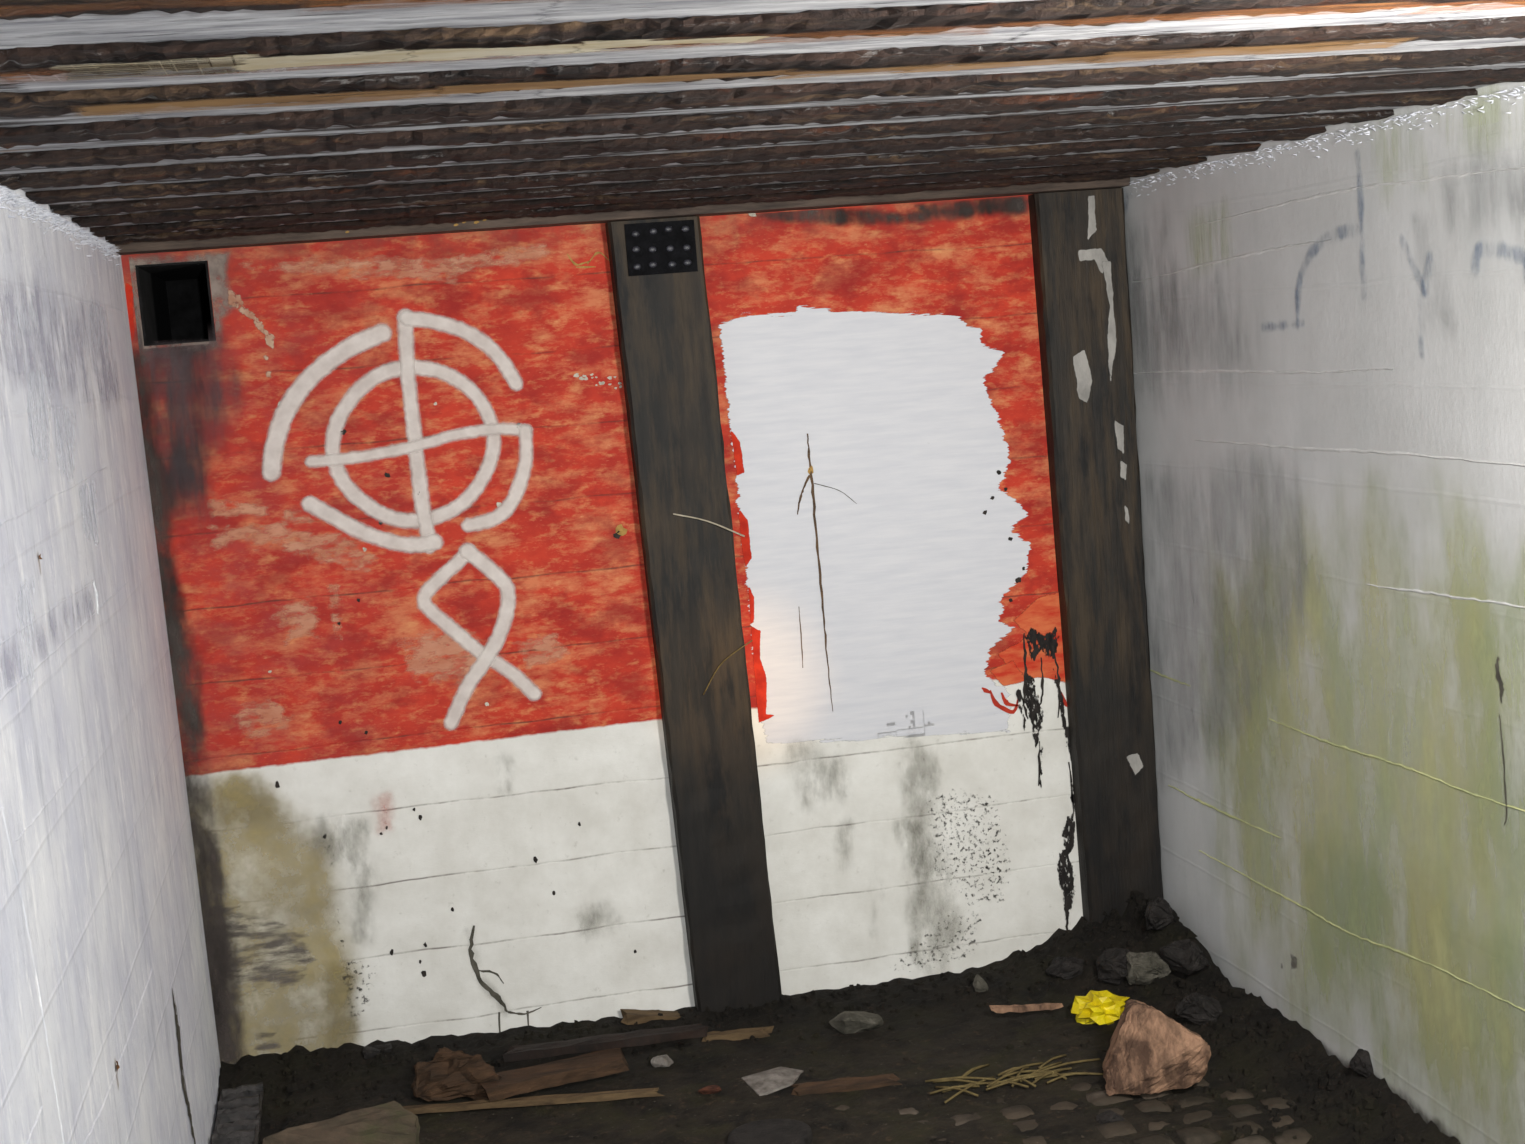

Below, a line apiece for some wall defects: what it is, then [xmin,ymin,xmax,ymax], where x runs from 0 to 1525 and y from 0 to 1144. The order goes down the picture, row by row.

peeling [731,431,744,475]
peeling [739,511,752,566]
water stain [158,558,200,729]
peeling [748,588,774,722]
water stain [920,795,1010,900]
water stain [191,777,370,1064]
crack [468,925,542,1032]
water stain [895,915,981,970]